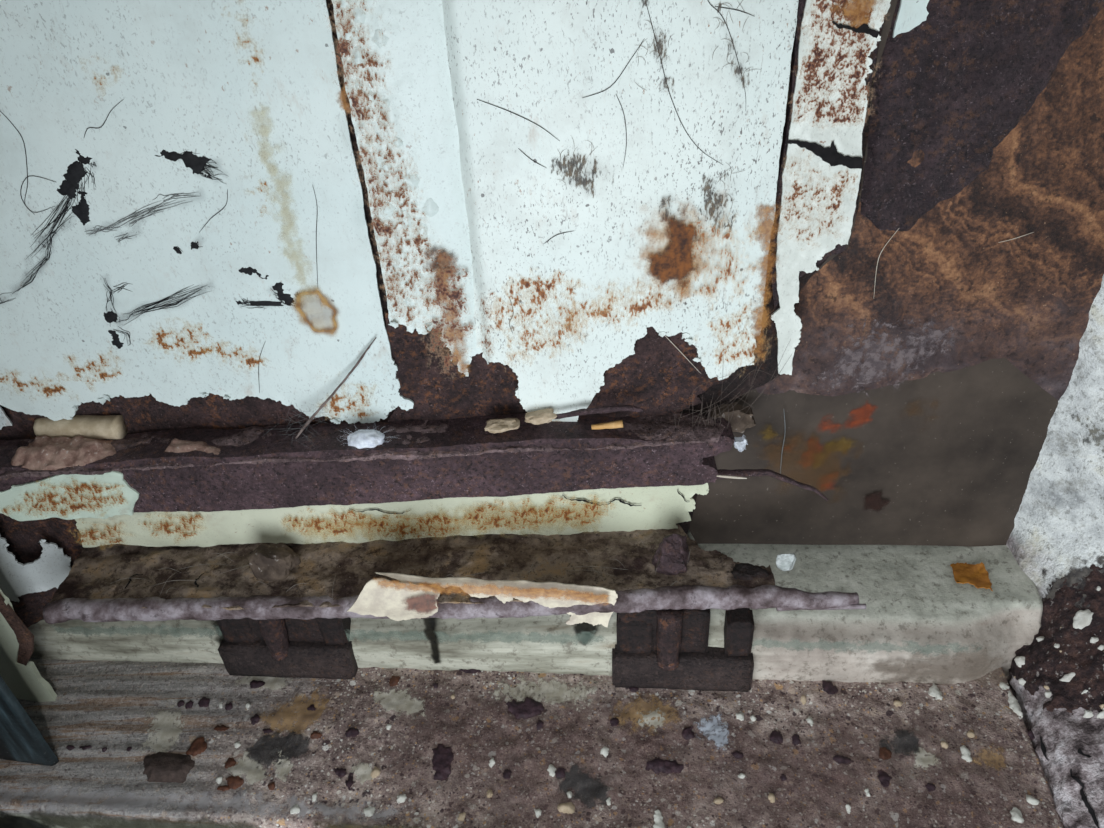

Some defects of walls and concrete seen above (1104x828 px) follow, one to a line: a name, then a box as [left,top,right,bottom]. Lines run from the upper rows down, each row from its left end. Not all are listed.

crack [785,140,863,169]
rust [332,0,1104,400]
rust [151,324,263,369]
peeling [375,310,527,422]
peeling [581,327,731,418]
water stain [812,314,973,429]
peeling [0,407,47,440]
peeling [72,393,359,434]
rust [283,496,613,540]